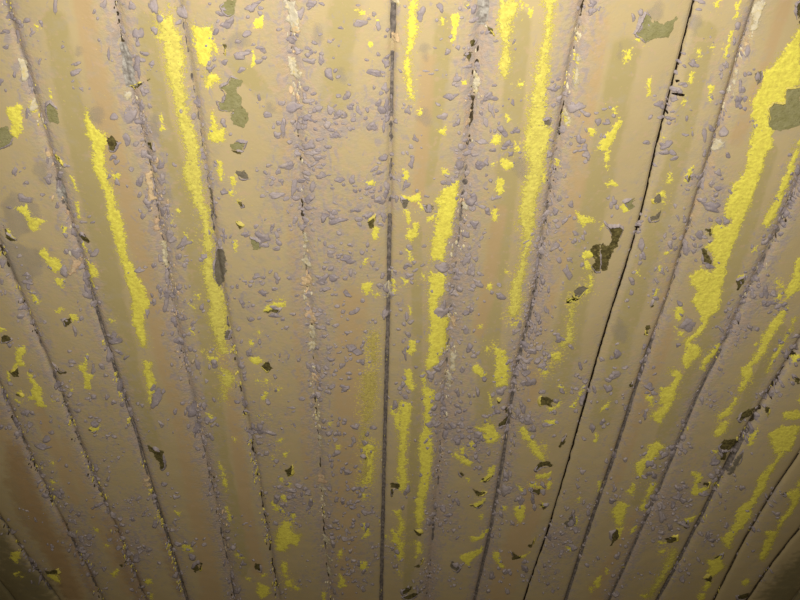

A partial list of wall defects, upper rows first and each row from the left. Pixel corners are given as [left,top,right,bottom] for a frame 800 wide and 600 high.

peeling [588,106,623,188]
peeling [150,2,249,404]
peeling [643,0,800,426]
peeling [263,298,287,314]
peeling [249,340,283,400]
peeling [147,445,167,471]
peeling [608,438,666,546]
peeling [697,256,800,600]